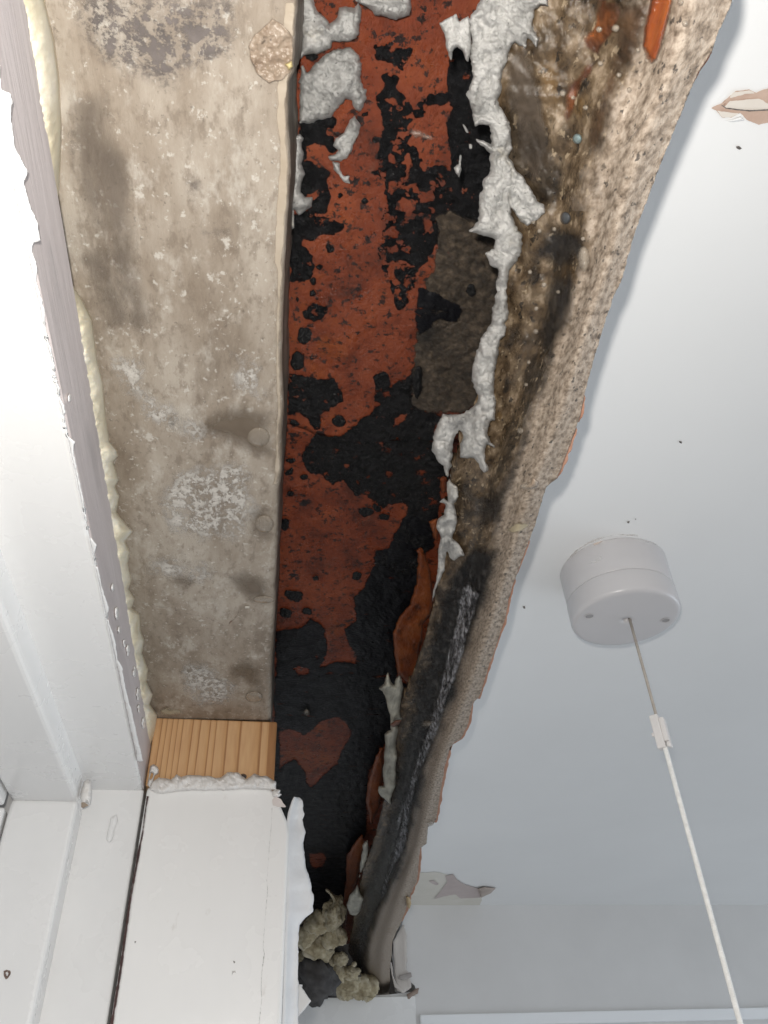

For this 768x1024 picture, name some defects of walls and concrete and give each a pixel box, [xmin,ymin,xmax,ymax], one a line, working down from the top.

damp [85,0,230,76]
peeling [712,89,768,125]
damp [82,106,123,226]
damp [533,231,582,357]
damp [164,465,264,537]
damp [471,473,513,522]
damp [183,666,234,704]
damp [353,551,496,973]
flaking render [272,797,314,1024]
peeling [406,872,496,909]
spalling [389,925,419,999]